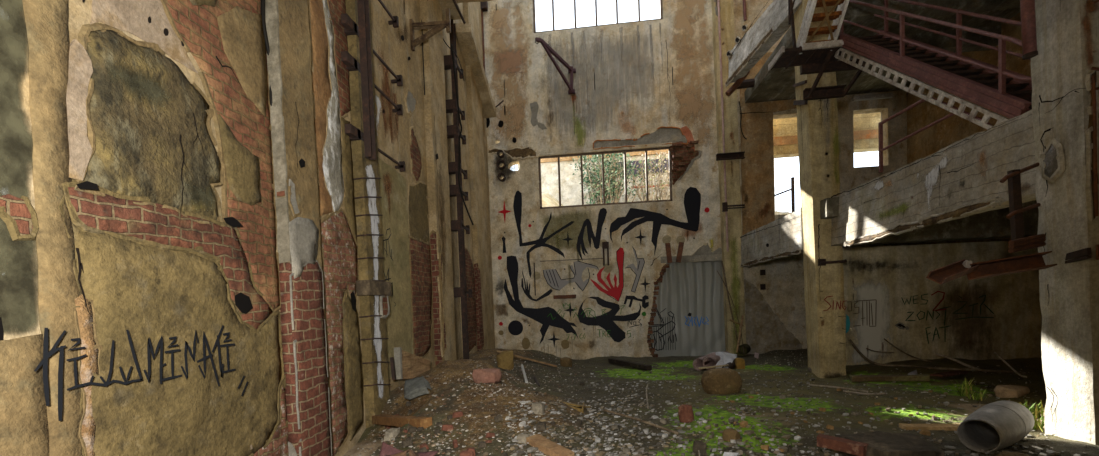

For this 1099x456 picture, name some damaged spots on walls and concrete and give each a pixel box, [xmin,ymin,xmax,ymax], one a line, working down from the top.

flaking render [0,194,39,241]
flaking render [58,0,359,456]
flaking render [405,88,447,366]
crack [76,248,93,319]
spalling [647,264,669,357]